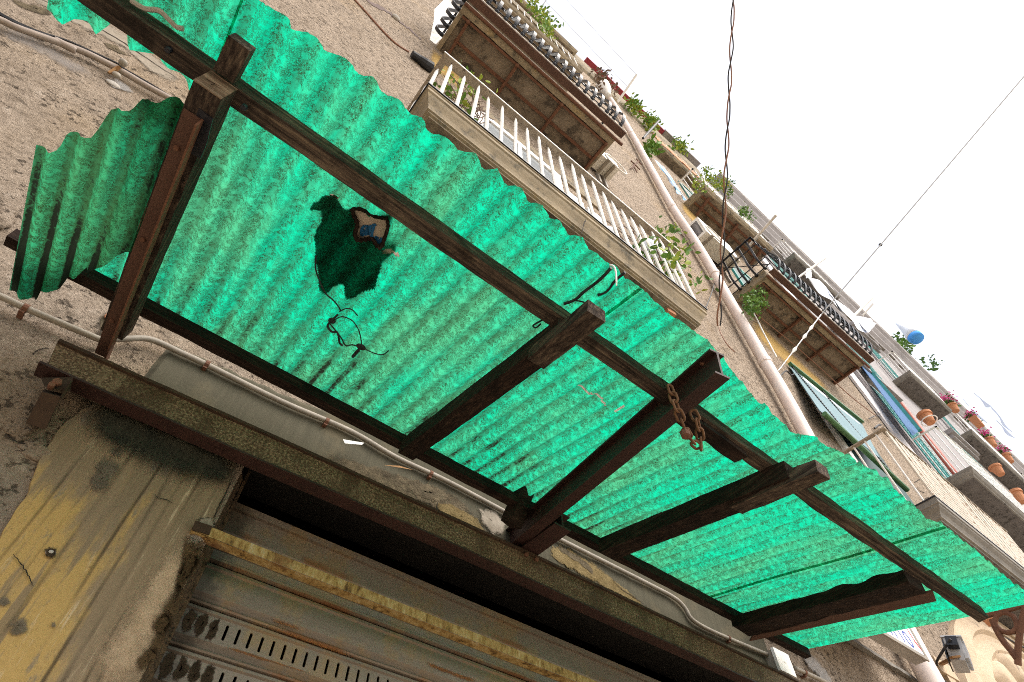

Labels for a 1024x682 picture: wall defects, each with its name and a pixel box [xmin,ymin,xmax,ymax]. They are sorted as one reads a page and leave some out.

water stain [90,406,234,481]
flaking render [330,455,505,534]
flaking render [551,545,647,607]